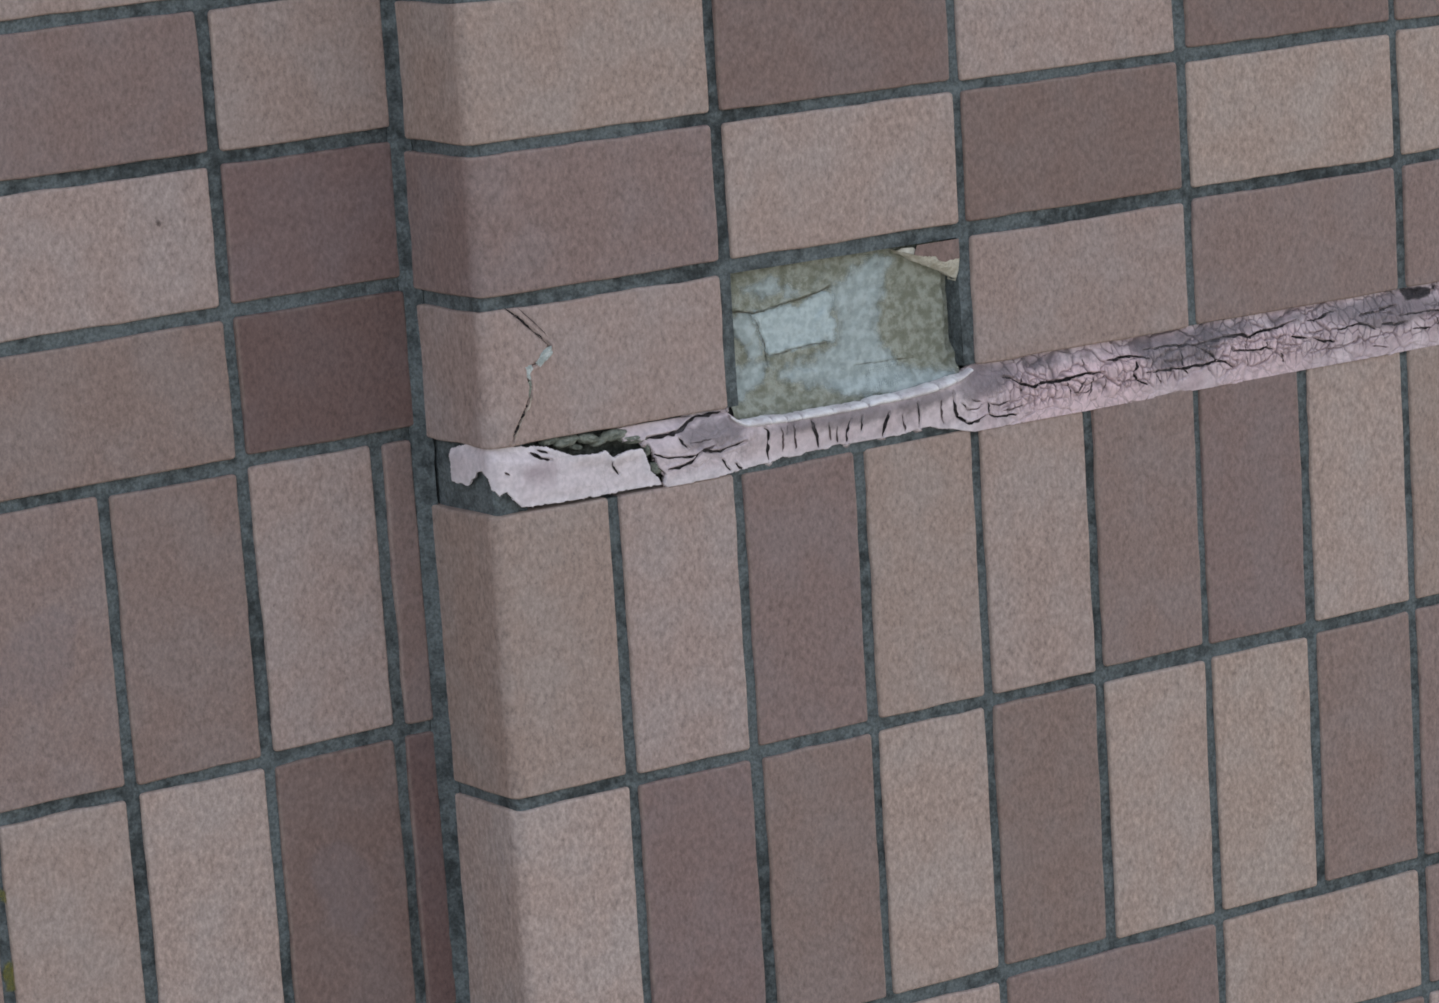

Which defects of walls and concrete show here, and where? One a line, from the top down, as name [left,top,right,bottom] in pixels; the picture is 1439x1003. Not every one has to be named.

crack [504,308,553,441]
spalling [727,239,973,427]
crack [647,305,1439,471]
peeling [449,444,661,507]